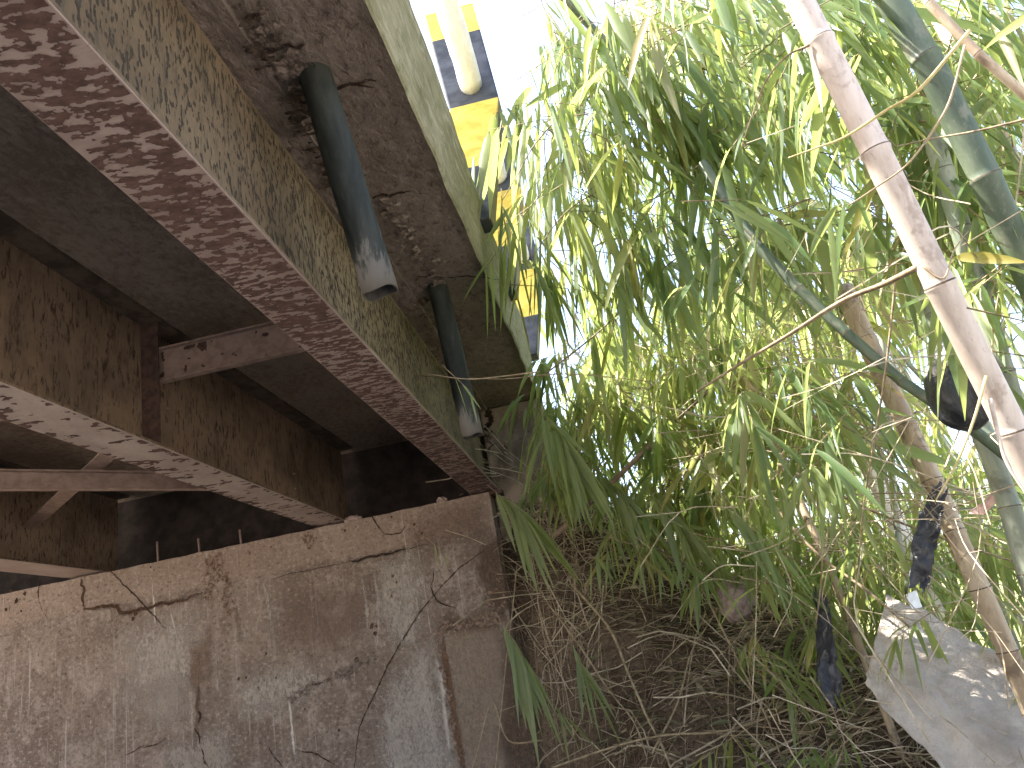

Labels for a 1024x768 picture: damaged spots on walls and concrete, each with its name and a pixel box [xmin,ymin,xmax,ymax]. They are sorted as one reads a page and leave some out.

peeling [0,0,498,495]
peeling [0,385,346,550]
crack [274,511,429,579]
crack [80,571,209,768]
crack [269,551,483,768]